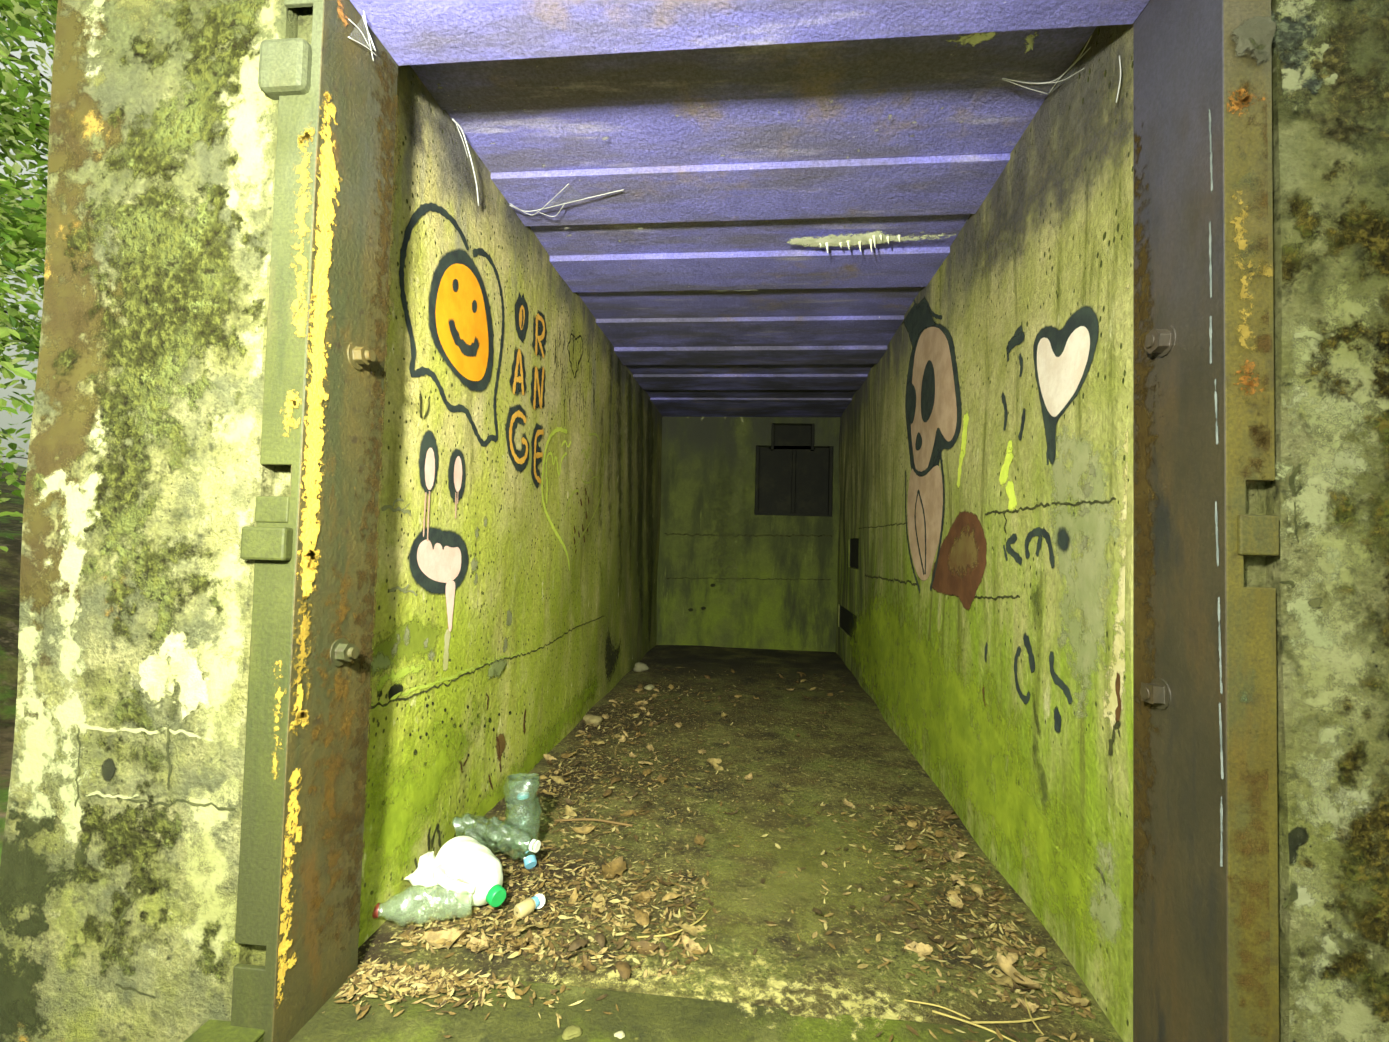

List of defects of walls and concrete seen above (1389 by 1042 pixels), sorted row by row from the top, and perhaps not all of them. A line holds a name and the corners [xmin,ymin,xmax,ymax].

peeling [336,0,348,28]
peeling [217,0,281,248]
damp [786,222,956,253]
damp [977,80,1131,276]
corrosion [1227,83,1272,158]
corrosion [1230,191,1273,403]
damp [0,0,135,1042]
peeling [131,254,271,981]
peeling [271,91,343,1003]
corrosion [303,51,398,950]
corrosion [1243,426,1270,476]
crack [74,723,235,811]